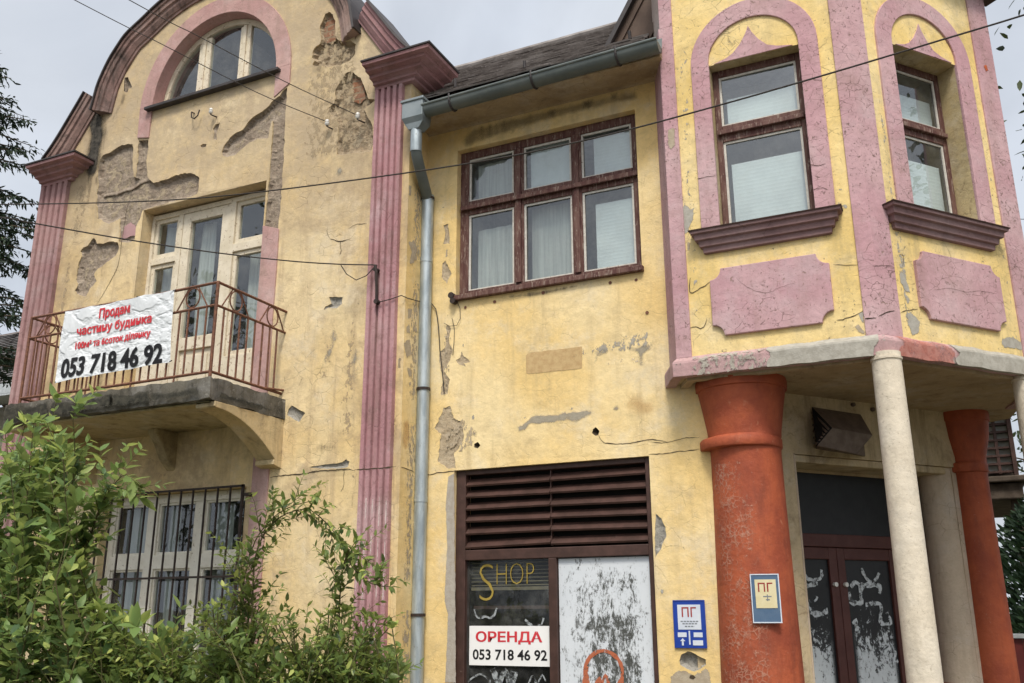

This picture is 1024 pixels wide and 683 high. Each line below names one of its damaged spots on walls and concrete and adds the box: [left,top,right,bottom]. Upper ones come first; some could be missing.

spalling [304,12,375,158]
spalling [200,88,287,228]
spalling [59,140,199,322]
peeling [442,224,451,283]
peeling [896,232,1024,376]
peeling [526,332,650,374]
peeling [692,312,879,375]
spalling [287,406,305,422]
flaking render [435,315,480,683]
spalling [655,513,666,557]
spalling [671,651,711,683]